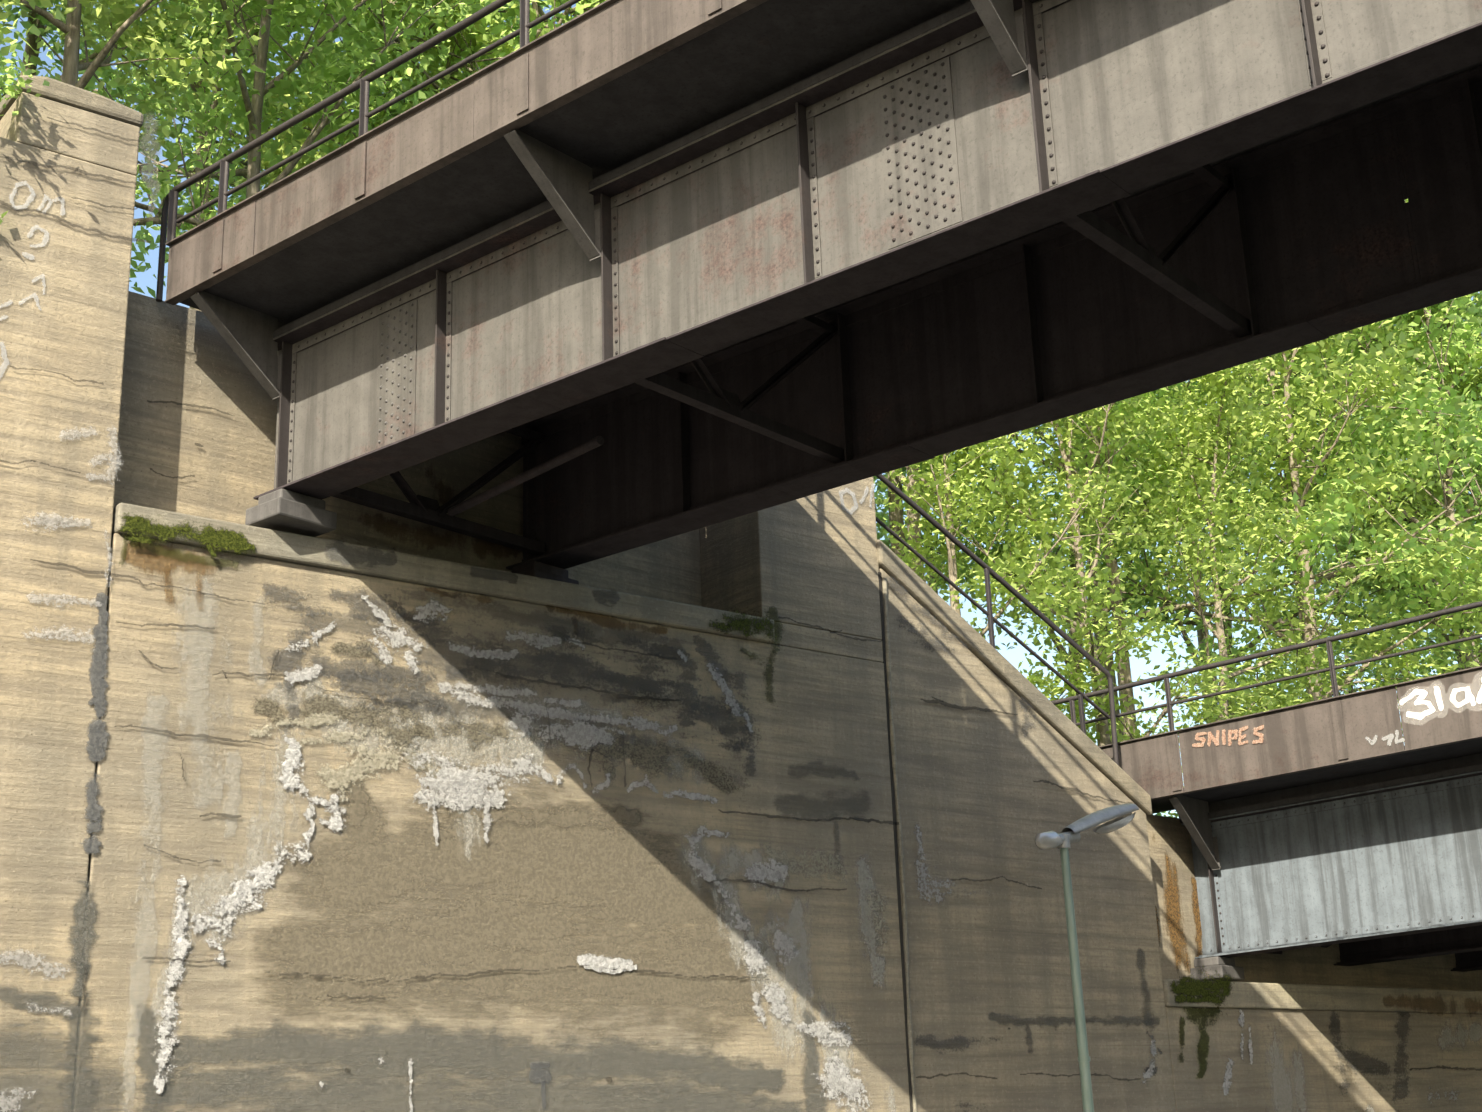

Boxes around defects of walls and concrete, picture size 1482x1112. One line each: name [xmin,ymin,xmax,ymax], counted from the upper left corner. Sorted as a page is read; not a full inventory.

water stain [30,513,90,527]
corrosion [125,541,212,602]
water stain [0,540,870,1112]
corrosion [1155,855,1202,971]
crack [142,956,230,964]
crack [265,966,576,1000]
crack [635,970,770,980]
water stain [916,949,1159,1083]
water stain [1223,1009,1306,1112]
water stain [1329,1011,1410,1101]